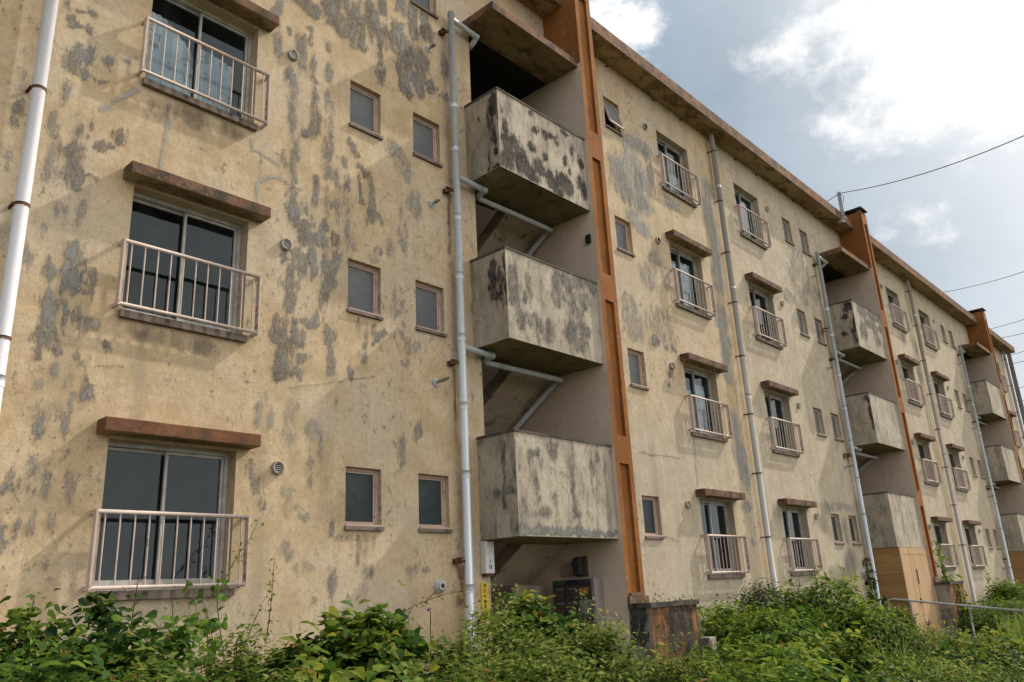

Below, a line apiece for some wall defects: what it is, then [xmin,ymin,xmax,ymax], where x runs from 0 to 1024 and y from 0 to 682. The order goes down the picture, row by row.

damp [478,90,588,204]
damp [488,249,595,353]
damp [493,438,581,519]